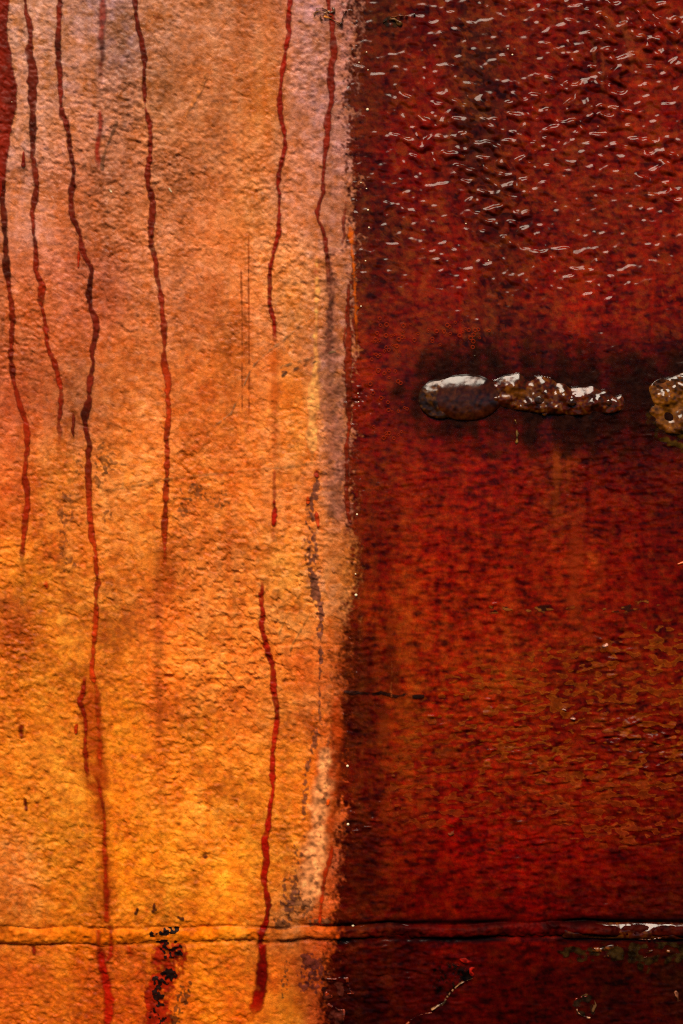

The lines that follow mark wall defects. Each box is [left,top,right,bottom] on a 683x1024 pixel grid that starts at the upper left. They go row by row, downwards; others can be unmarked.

corrosion [132,0,171,555]
corrosion [267,0,293,336]
corrosion [315,0,338,265]
corrosion [0,0,115,1024]
corrosion [250,585,280,1012]